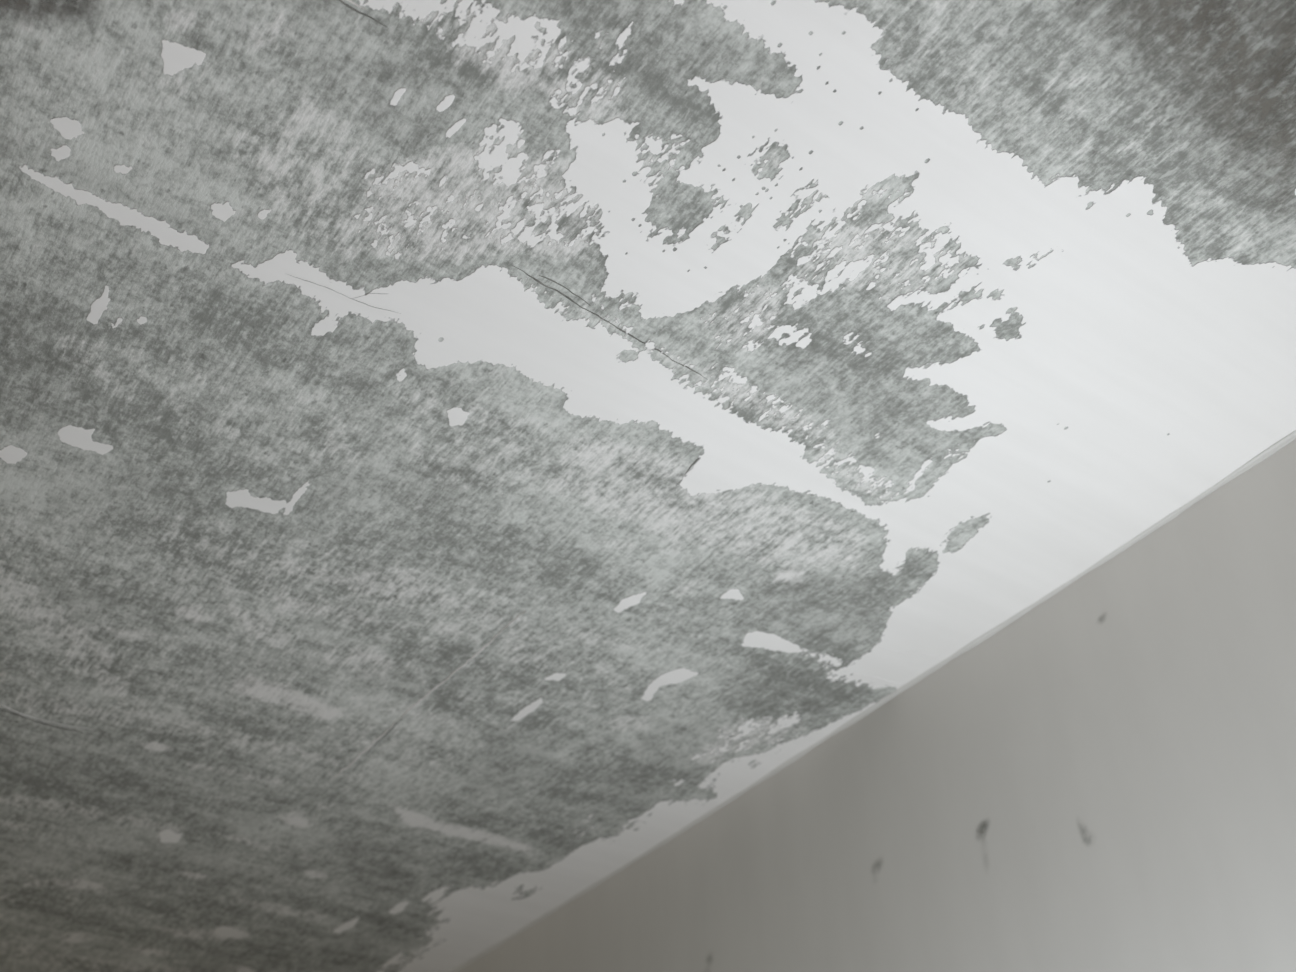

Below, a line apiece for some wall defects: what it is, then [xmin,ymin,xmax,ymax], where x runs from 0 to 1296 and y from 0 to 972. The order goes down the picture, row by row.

damp [0,0,76,16]
damp [1131,0,1296,173]